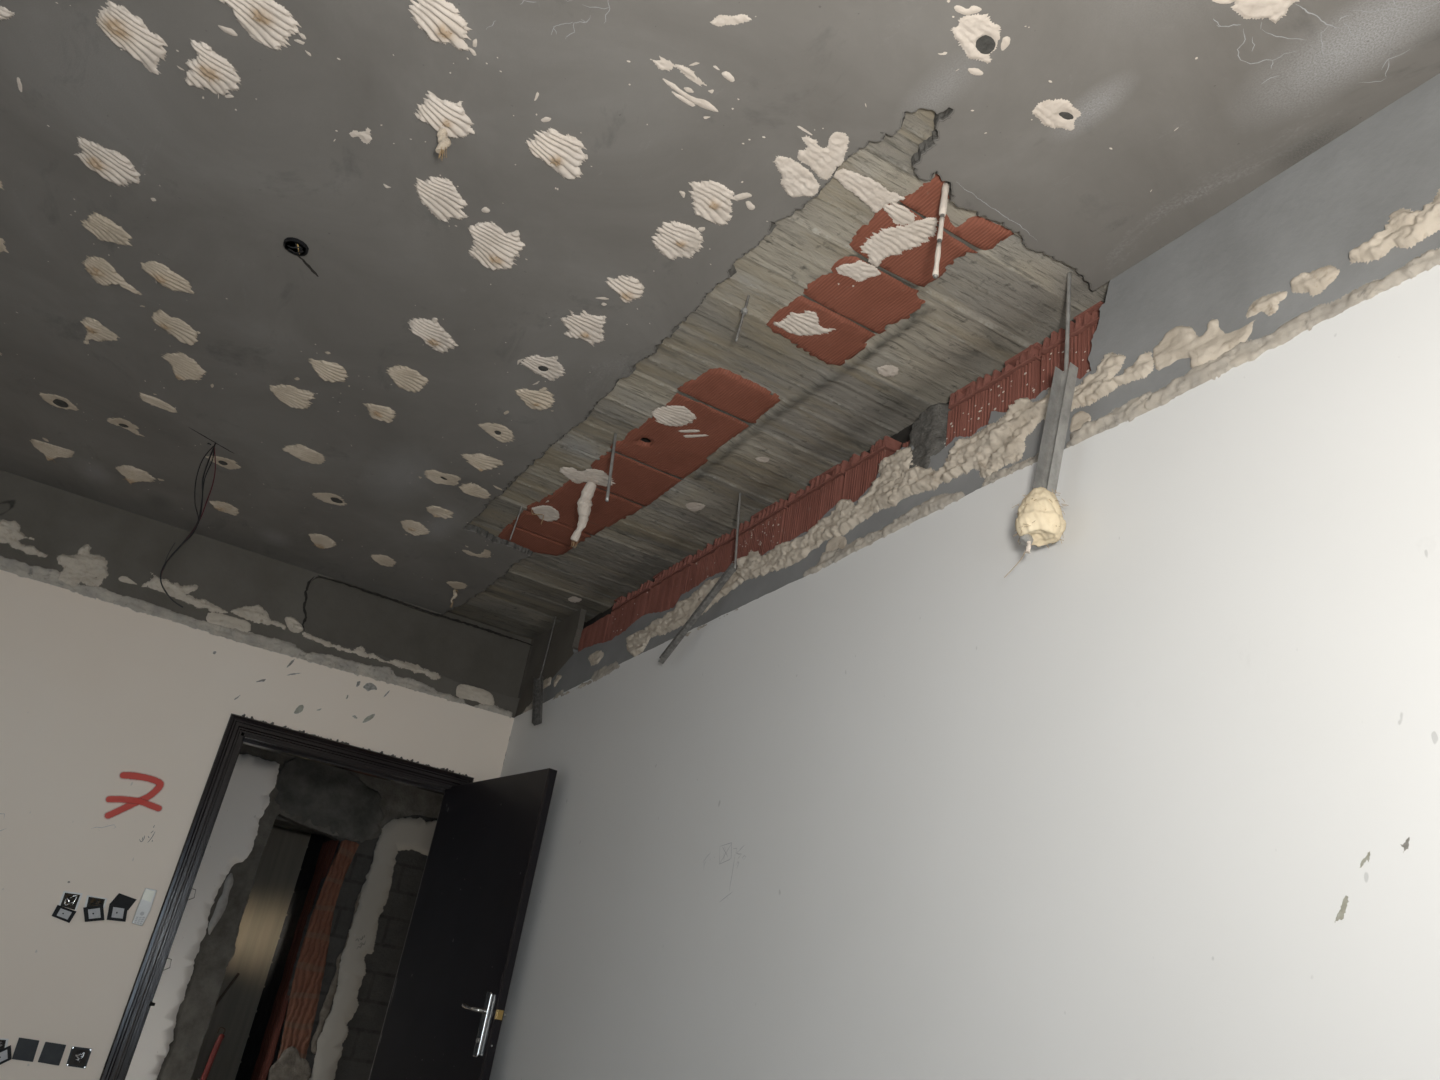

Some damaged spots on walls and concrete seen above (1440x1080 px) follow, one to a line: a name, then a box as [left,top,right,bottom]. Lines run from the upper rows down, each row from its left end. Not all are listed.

spalling [304,109,918,699]
spalling [911,108,1026,247]